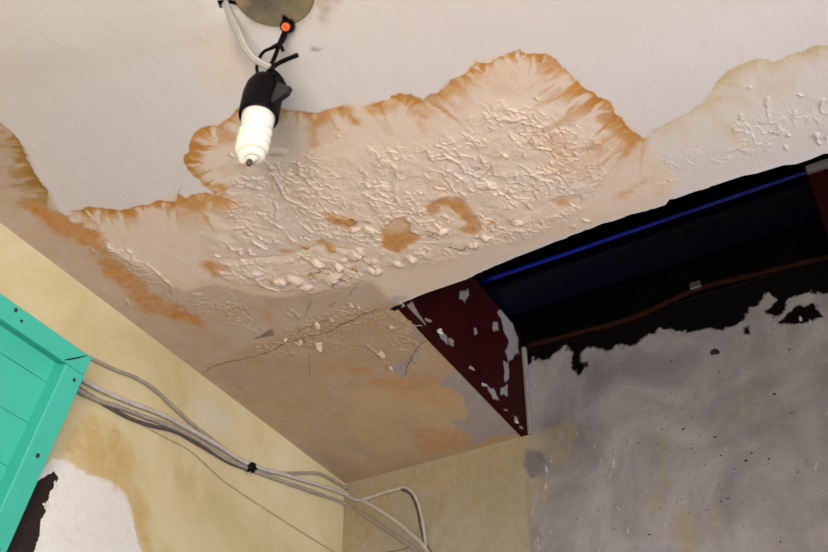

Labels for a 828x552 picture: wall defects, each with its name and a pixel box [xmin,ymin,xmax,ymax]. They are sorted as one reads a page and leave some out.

leakage [62,41,828,325]
peeling [623,90,828,206]
leakage [0,122,582,552]
crack [207,286,386,371]
peeling [210,295,454,378]
peeling [458,288,469,305]
peeling [439,309,527,447]
leakage [527,260,828,378]
spalling [771,301,825,326]
peeling [7,471,58,552]